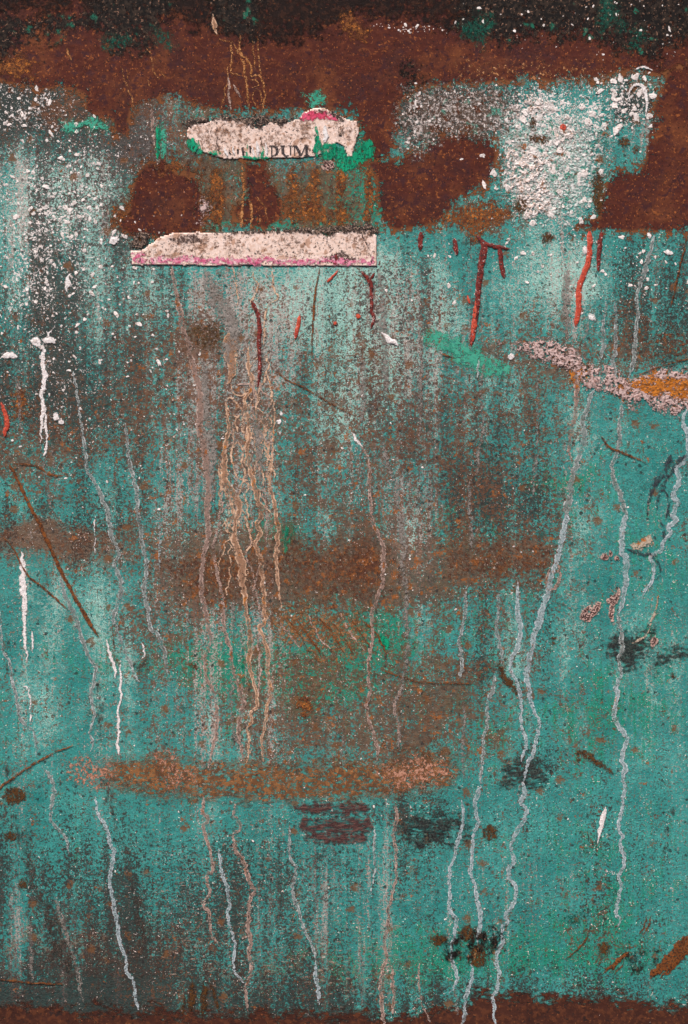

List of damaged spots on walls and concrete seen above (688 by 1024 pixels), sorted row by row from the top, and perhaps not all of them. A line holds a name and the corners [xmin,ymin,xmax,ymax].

rust [0,0,688,245]
leakage [39,345,56,509]
leakage [144,159,283,768]
rust [161,532,408,665]
rust [439,530,561,588]
rust [61,747,460,807]
rust [0,981,688,1024]